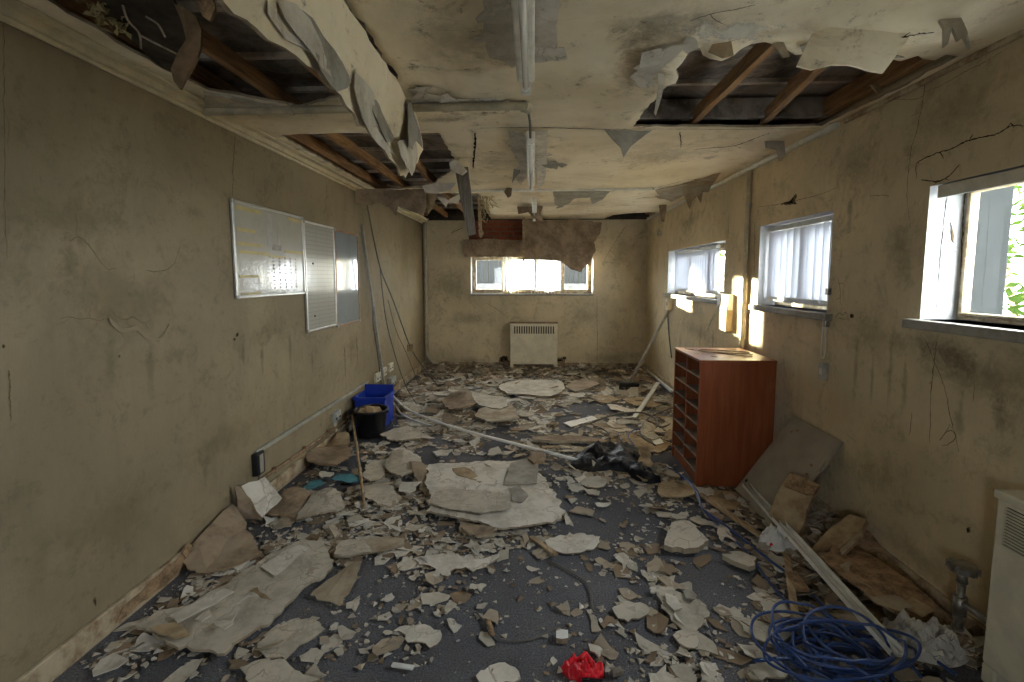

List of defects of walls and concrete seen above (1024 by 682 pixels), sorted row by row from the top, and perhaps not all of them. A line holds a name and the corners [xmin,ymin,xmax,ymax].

peeling [630,36,699,89]
crack [470,133,478,168]
crack [872,50,1022,316]
flaking render [468,220,523,241]
crack [909,337,959,452]